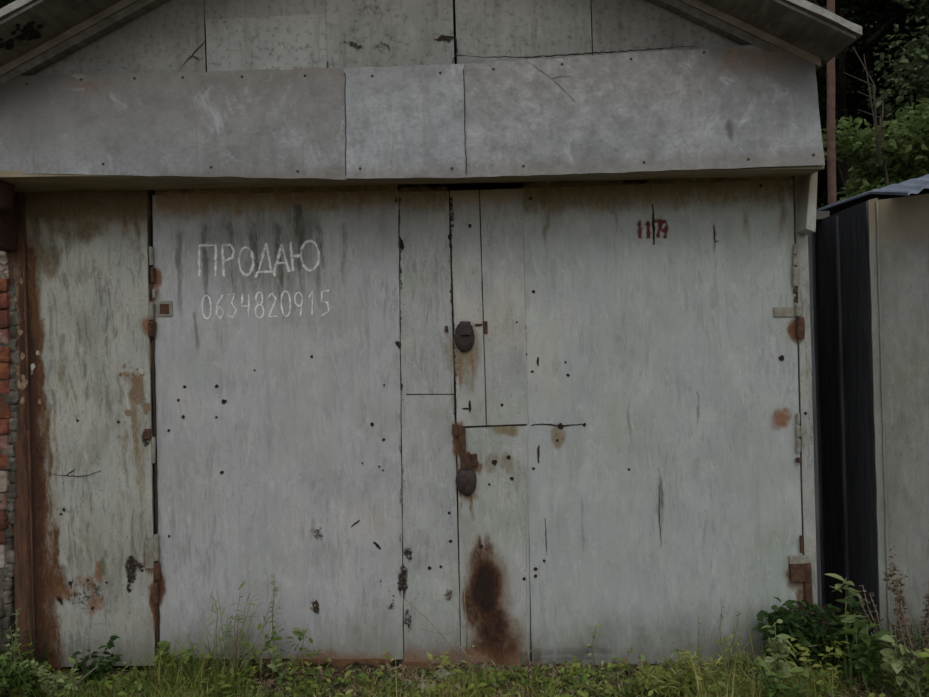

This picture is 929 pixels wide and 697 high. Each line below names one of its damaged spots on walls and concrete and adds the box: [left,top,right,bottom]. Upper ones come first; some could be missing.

corrosion [787,319,801,342]
corrosion [18,234,103,674]
corrosion [774,410,790,427]
corrosion [464,542,521,662]